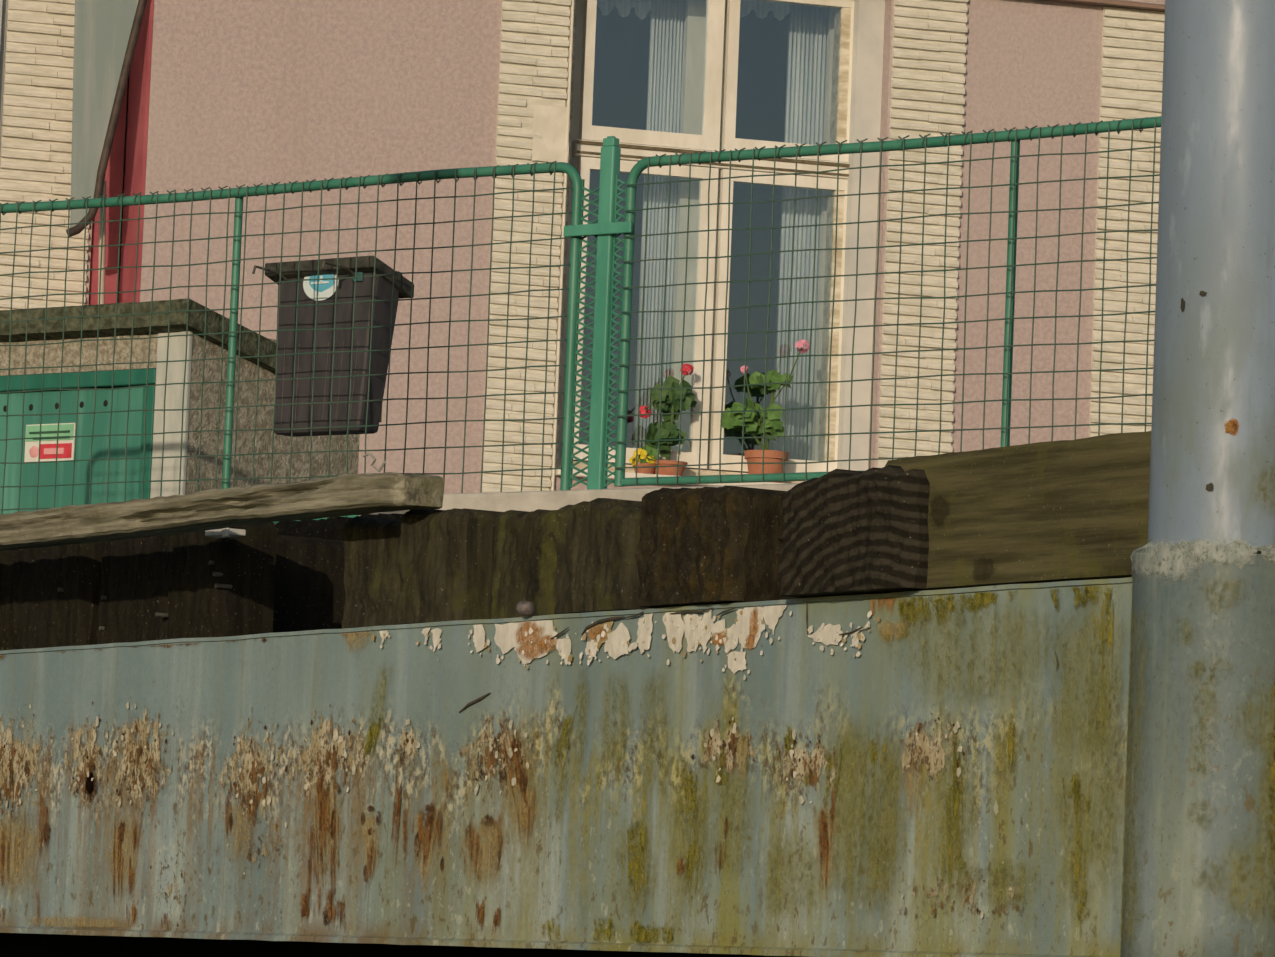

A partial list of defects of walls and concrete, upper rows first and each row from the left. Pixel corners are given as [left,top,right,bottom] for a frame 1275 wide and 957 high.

rust [1225,419,1239,435]
peeling [416,628,442,660]
peeling [468,605,792,680]
peeling [807,611,880,657]
water stain [879,590,1017,640]
water stain [779,728,795,766]
rust [301,717,345,929]
rust [361,772,443,882]
rust [464,720,535,879]
water stain [941,754,963,881]
rust [37,822,140,928]
rust [476,901,500,931]